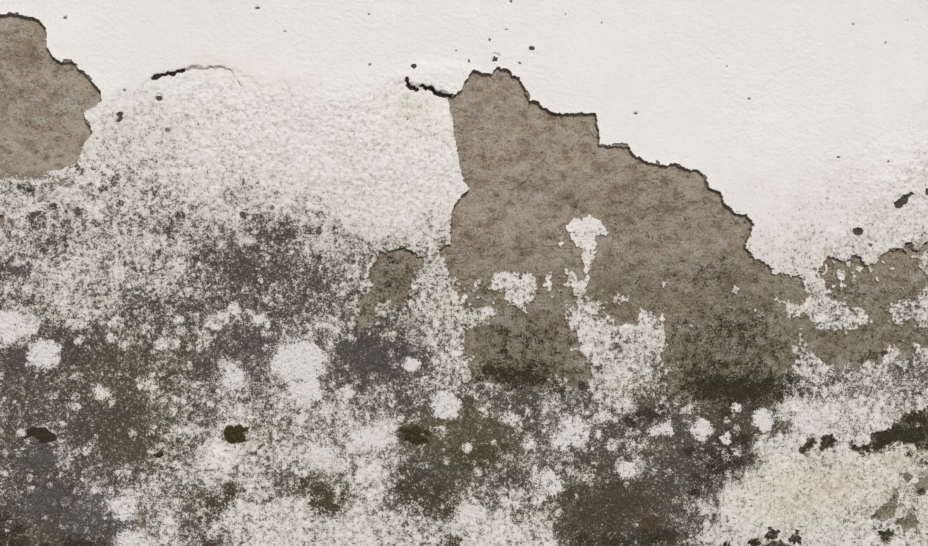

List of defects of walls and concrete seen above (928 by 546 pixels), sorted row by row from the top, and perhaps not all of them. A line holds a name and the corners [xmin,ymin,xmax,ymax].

spalling [0,12,102,177]
crack [151,65,242,87]
spalling [408,56,928,411]
leakage [0,263,36,277]
leakage [210,325,275,356]
leakage [334,336,425,384]
leakage [472,362,566,396]
leakage [623,404,669,428]
leakage [672,367,805,496]
mould [852,410,928,467]
leakage [0,426,140,546]
mould [570,528,688,546]